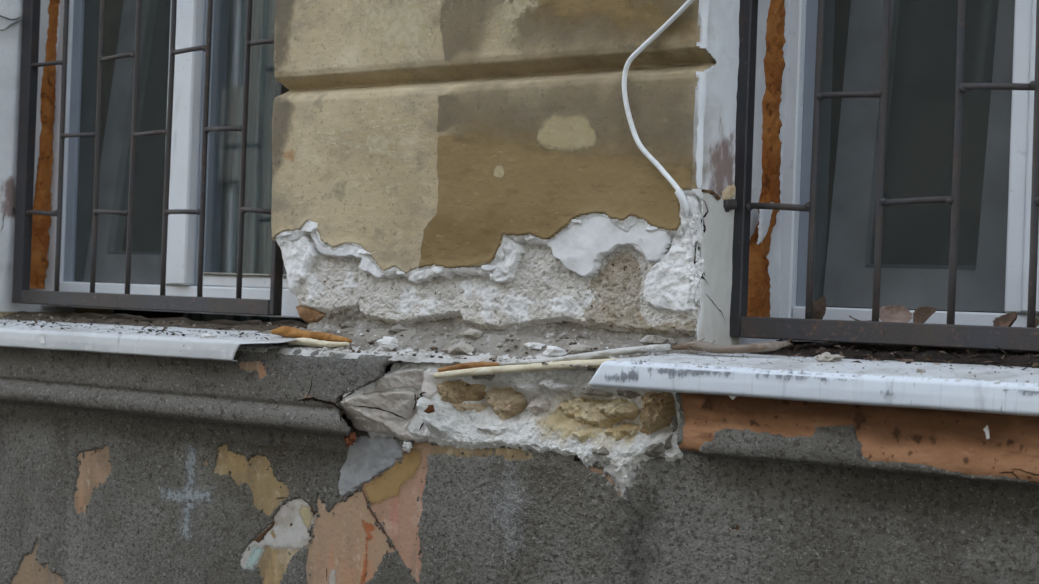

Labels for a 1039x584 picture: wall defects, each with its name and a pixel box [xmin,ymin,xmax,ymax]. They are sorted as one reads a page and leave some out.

spalling [276,184,740,359]
peeling [74,446,112,514]
peeling [203,368,533,584]
peeling [678,393,1039,482]
crack [1000,469,1039,480]
peeling [11,539,64,584]